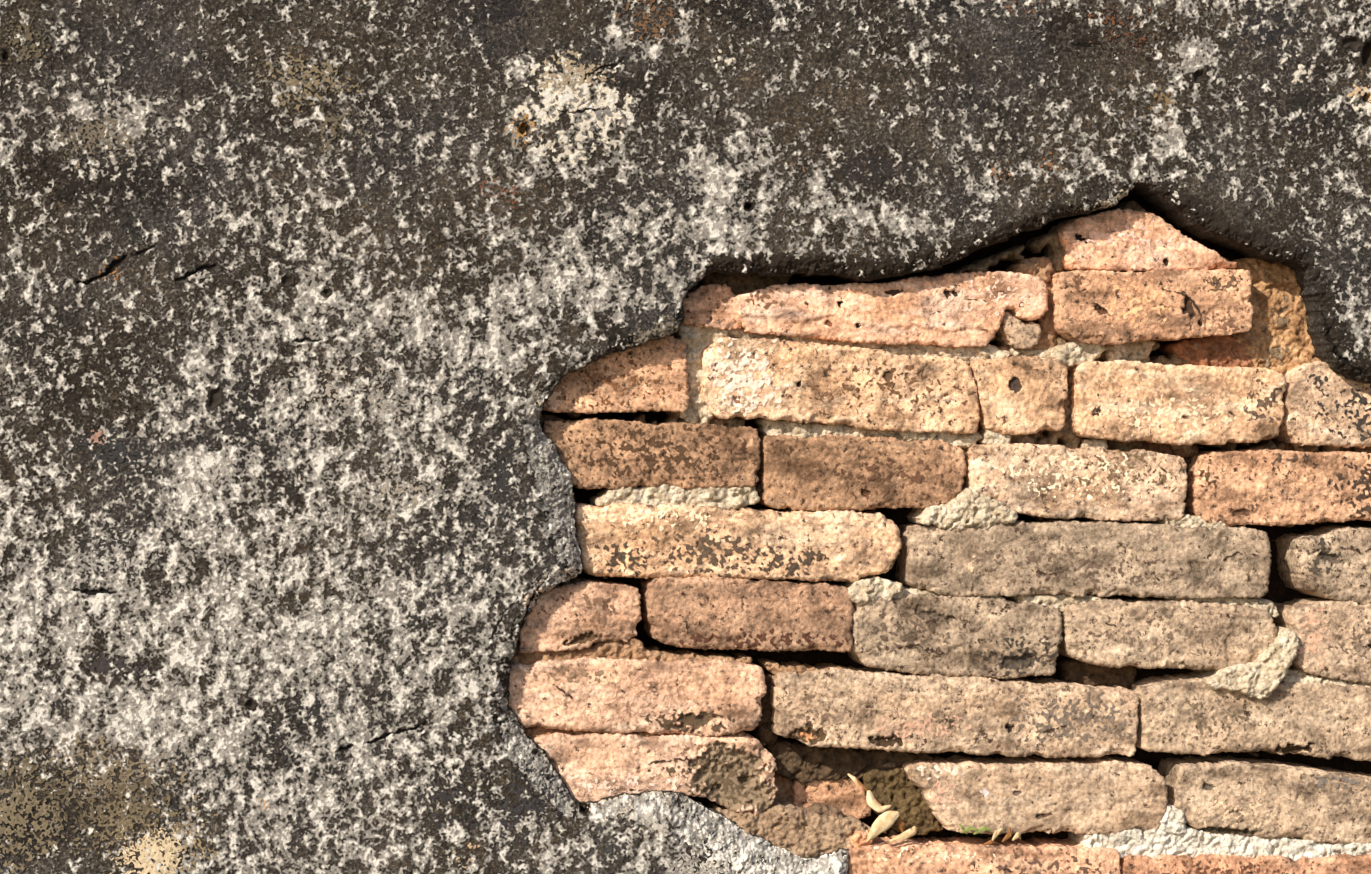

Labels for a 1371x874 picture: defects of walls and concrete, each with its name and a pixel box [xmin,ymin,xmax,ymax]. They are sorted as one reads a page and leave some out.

spalling [704,186,1134,296]
crack [77,245,155,285]
crack [175,265,216,281]
spalling [1155,179,1371,383]
peeling [1009,377,1022,393]
spalling [521,388,581,619]
peeling [1230,509,1250,517]
peeling [563,631,598,646]
peeling [868,732,903,747]
peeling [1275,742,1314,753]
peeling [500,721,847,874]
peeling [1201,827,1250,836]